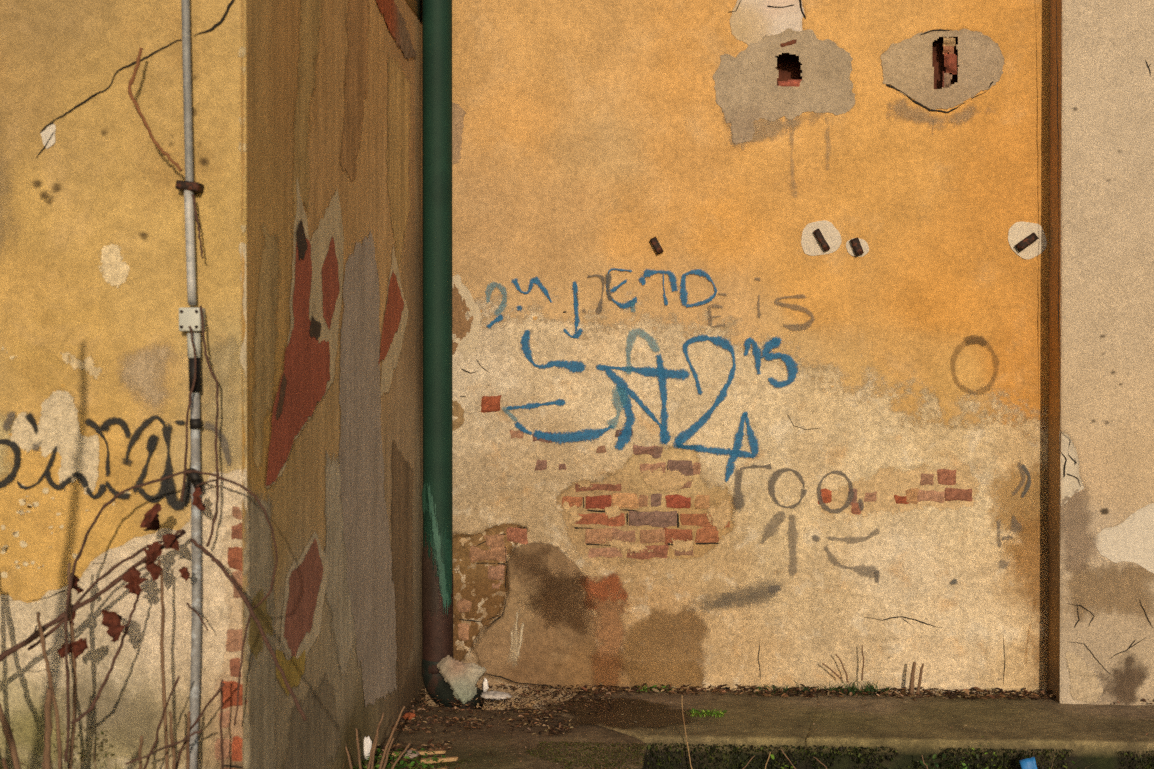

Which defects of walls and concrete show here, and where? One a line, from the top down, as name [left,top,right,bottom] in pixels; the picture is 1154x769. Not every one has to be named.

crack [36,0,234,157]
flaking render [730,0,806,46]
spalling [775,53,802,86]
spalling [932,37,959,89]
peeling [0,225,277,769]
peeling [452,274,1084,710]
peeling [390,441,414,699]
damp [513,550,592,630]
peeling [1093,503,1154,573]
damp [511,612,524,664]